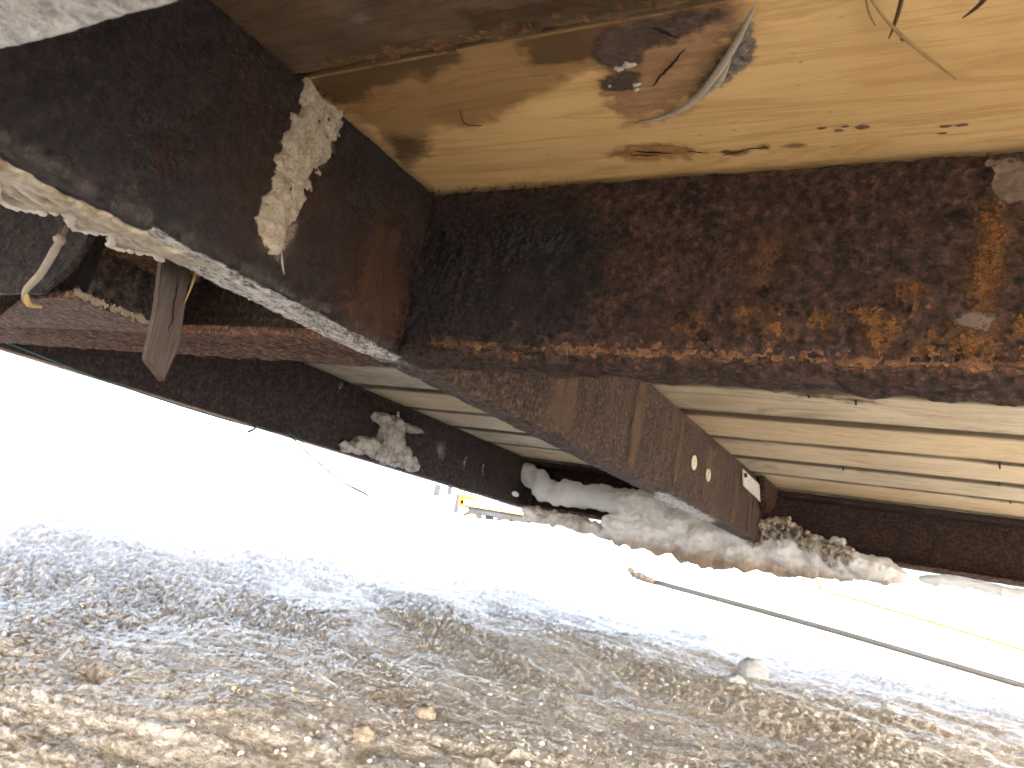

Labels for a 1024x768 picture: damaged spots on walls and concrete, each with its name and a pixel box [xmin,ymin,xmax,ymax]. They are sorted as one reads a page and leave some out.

damp [518,24,613,64]
damp [313,53,458,104]
crack [723,144,803,156]
rust [165,30,433,353]
rust [723,196,1024,366]